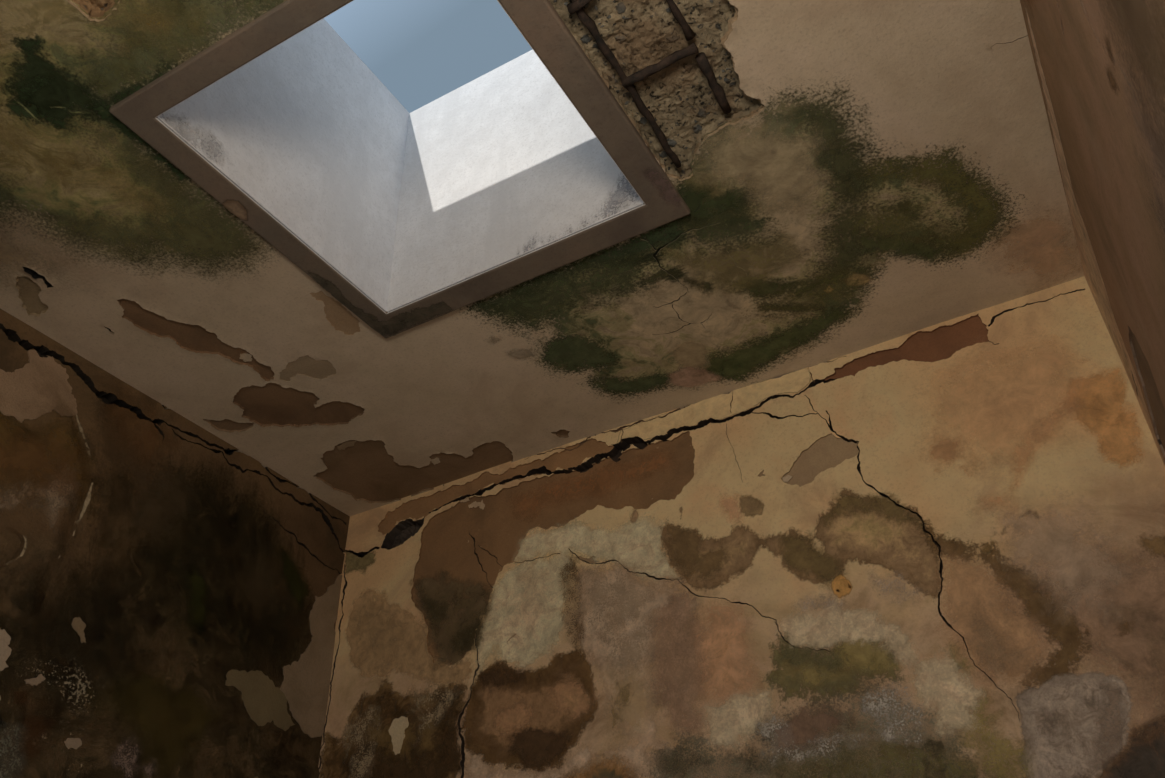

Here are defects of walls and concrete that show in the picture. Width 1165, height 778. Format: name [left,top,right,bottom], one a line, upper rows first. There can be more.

damp [0,0,284,276]
peeling [117,298,364,433]
damp [308,272,452,336]
spalling [549,0,764,181]
damp [467,90,1018,399]
peeling [824,314,989,383]
crack [988,289,1085,345]
crack [0,323,380,775]
crack [457,635,480,778]
peeling [313,429,695,666]
damp [0,413,1165,778]
crack [424,356,1020,721]